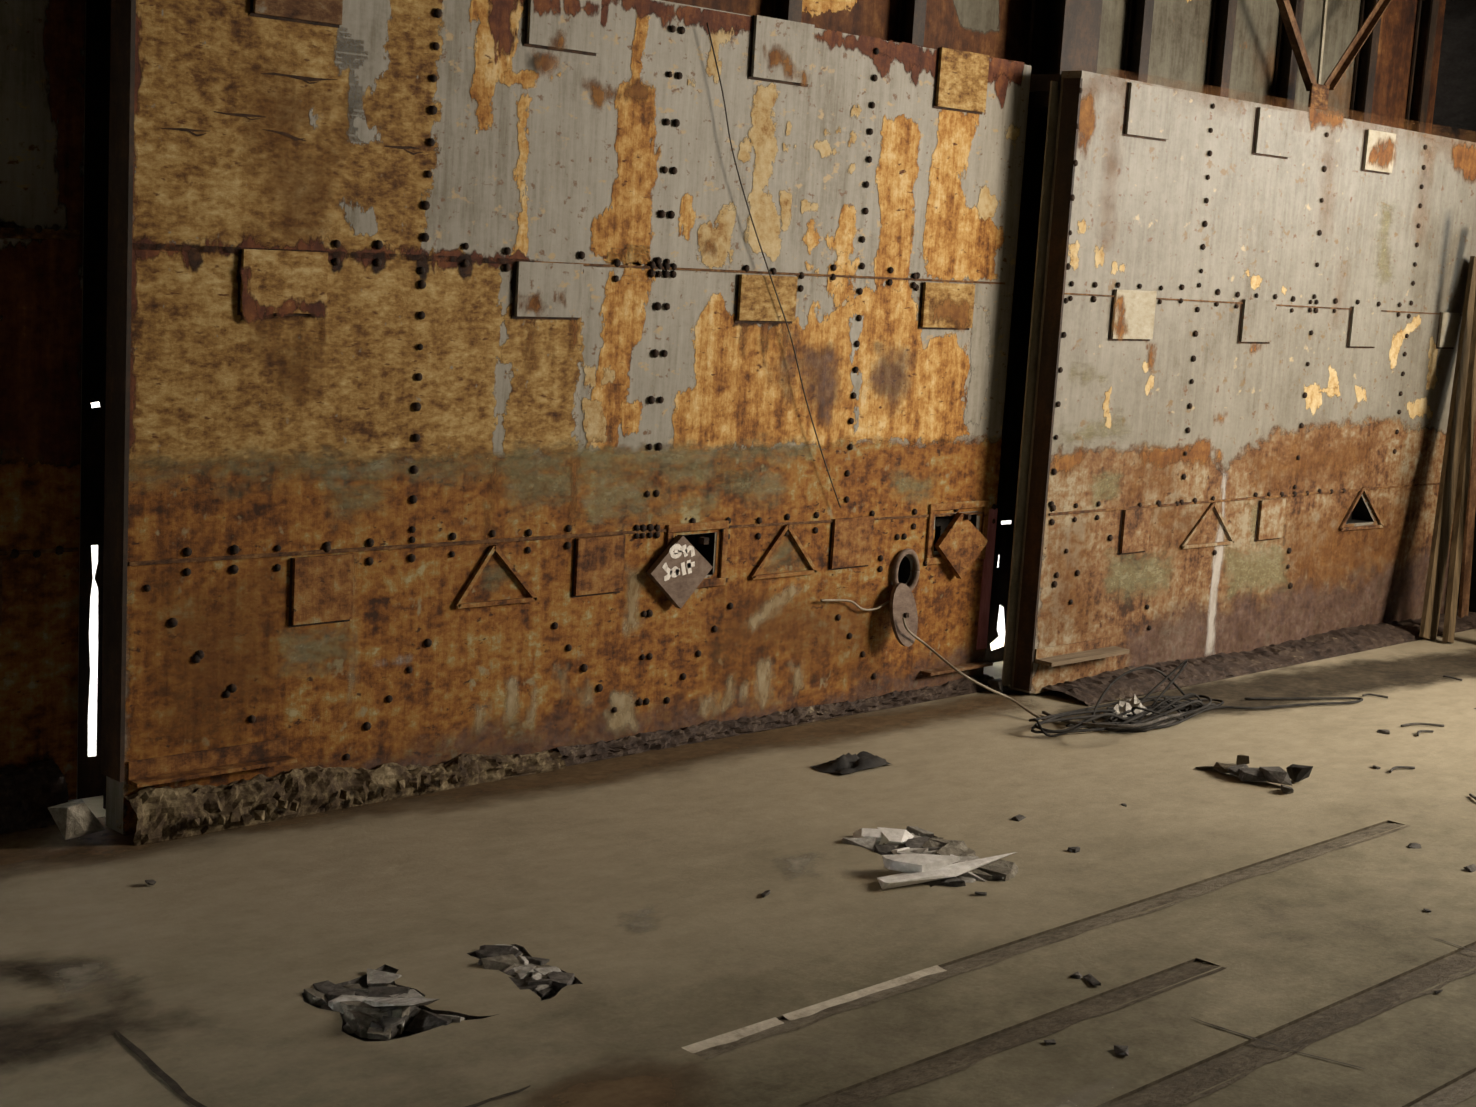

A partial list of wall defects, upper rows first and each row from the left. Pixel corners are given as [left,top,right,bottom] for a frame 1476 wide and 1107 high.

peeling [469,0,561,134]
peeling [688,27,739,87]
peeling [352,115,381,144]
peeling [339,198,378,236]
peeling [697,83,819,269]
peeling [977,185,1001,221]
peeling [1068,219,1125,275]
peeling [582,364,615,449]
peeling [1303,364,1367,416]
peeling [1389,314,1438,419]
corrosion [1053,419,1107,476]
corrosion [1141,439,1222,469]